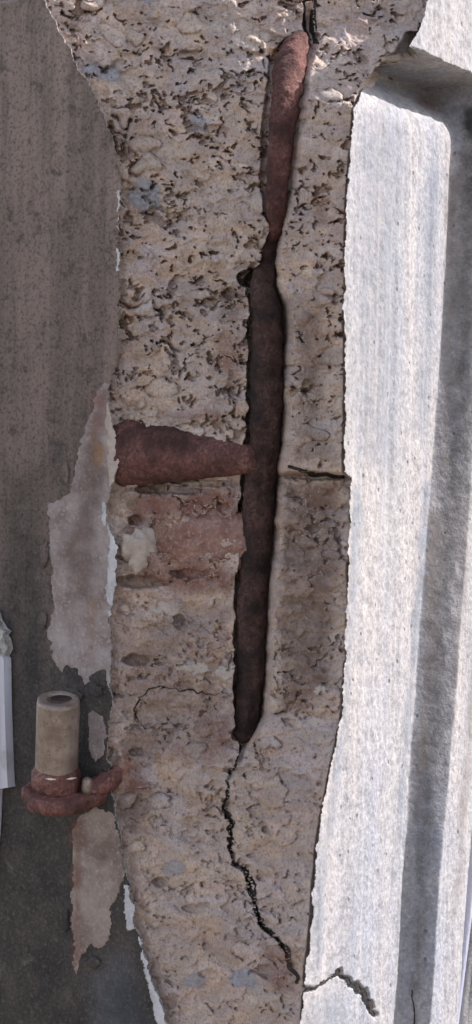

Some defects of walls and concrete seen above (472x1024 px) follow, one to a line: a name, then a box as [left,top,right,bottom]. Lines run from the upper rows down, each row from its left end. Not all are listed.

rust [133,31,311,744]
spalling [70,0,427,1024]
crack [221,745,375,1017]
rust [287,493,330,704]